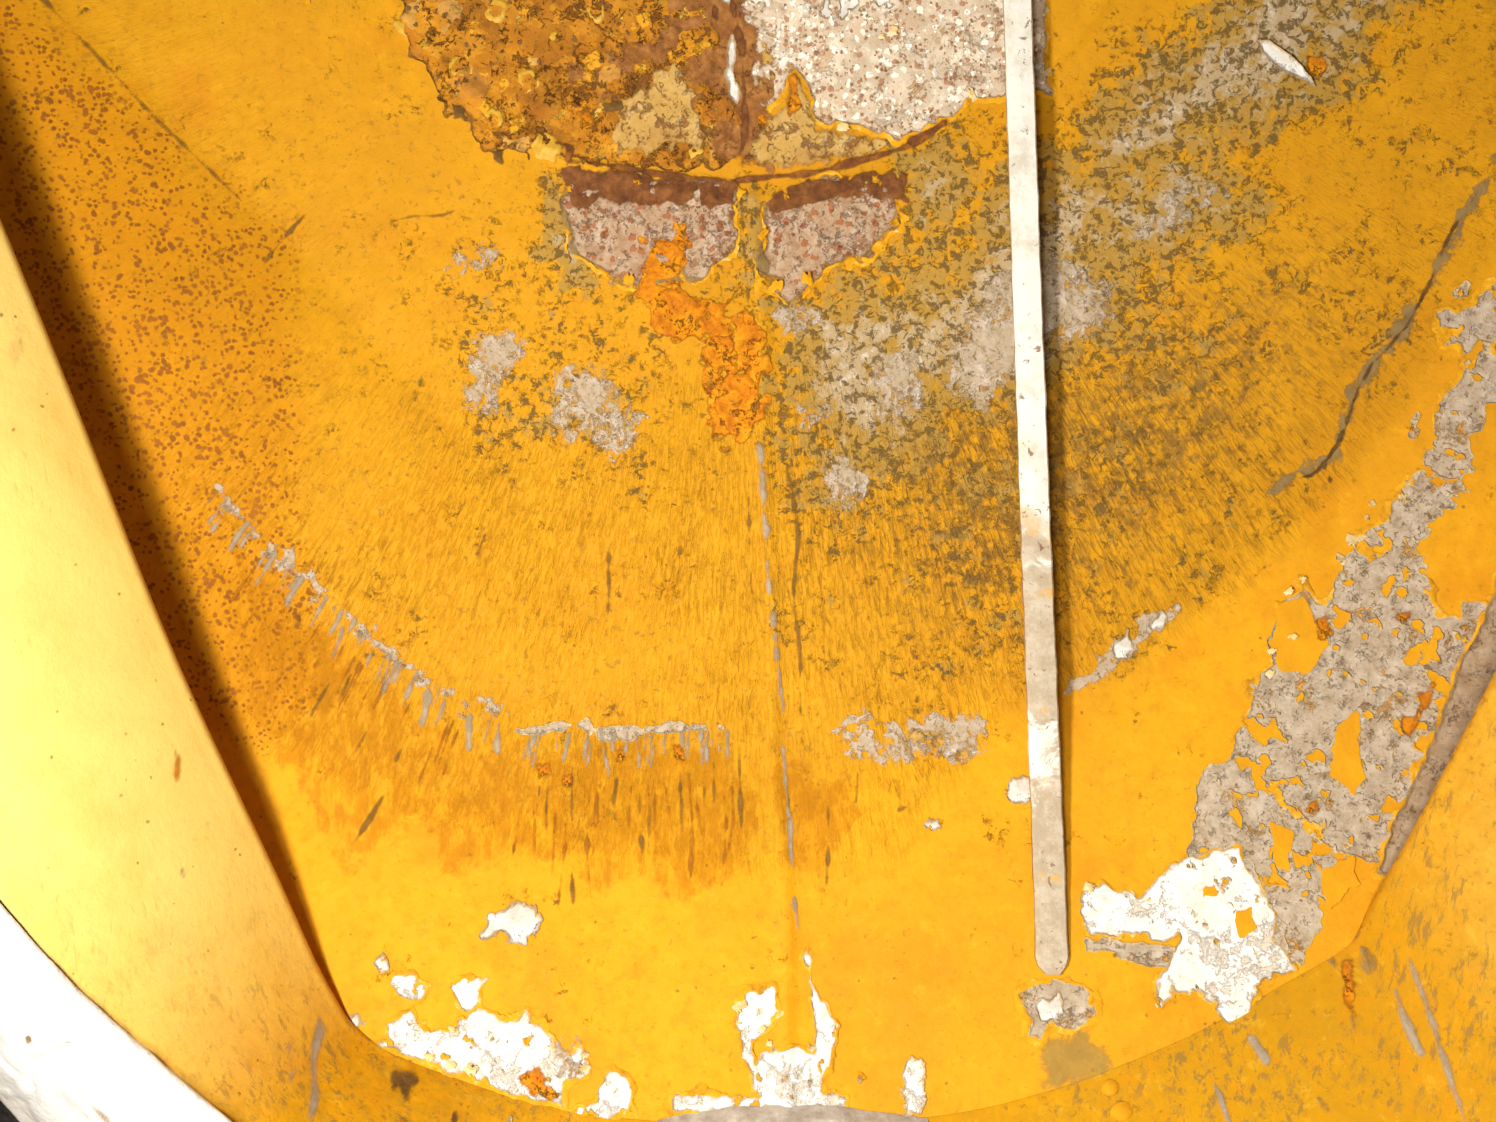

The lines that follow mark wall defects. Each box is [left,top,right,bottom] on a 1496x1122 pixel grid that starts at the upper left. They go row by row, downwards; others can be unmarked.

rust [567,0,886,175]
peeling [738,0,1006,148]
peeling [1032,0,1057,99]
rust [634,219,773,451]
peeling [557,143,909,338]
crack [1266,154,1496,496]
peeling [208,483,729,787]
peeling [831,707,988,766]
peeling [1064,276,1496,1024]
peeling [373,952,638,1120]
peeling [660,946,867,1118]
peeling [898,1056,927,1116]